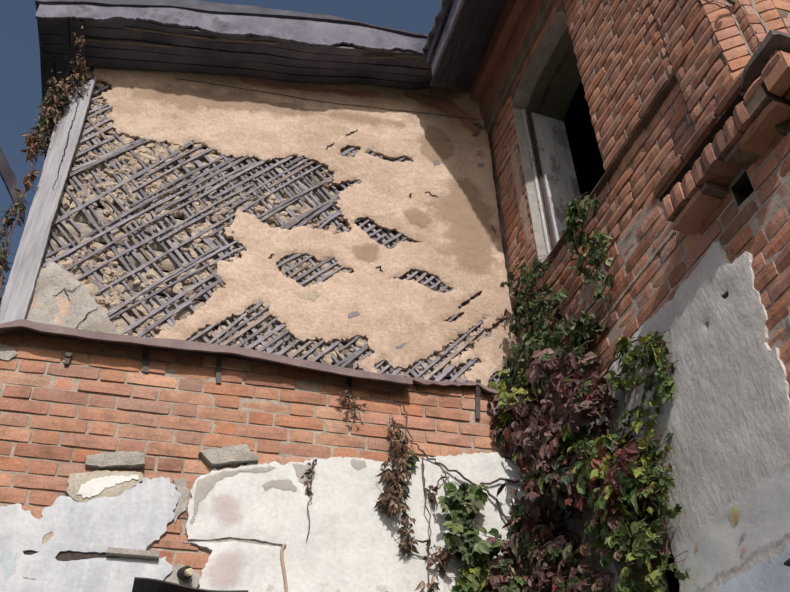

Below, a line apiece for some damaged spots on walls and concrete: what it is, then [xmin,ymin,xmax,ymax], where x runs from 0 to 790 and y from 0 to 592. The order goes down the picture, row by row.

leakage [421,127,452,161]
leakage [354,244,377,261]
leakage [406,181,498,272]
peeling [587,241,790,570]
peeling [0,452,535,592]
peeling [696,534,790,592]